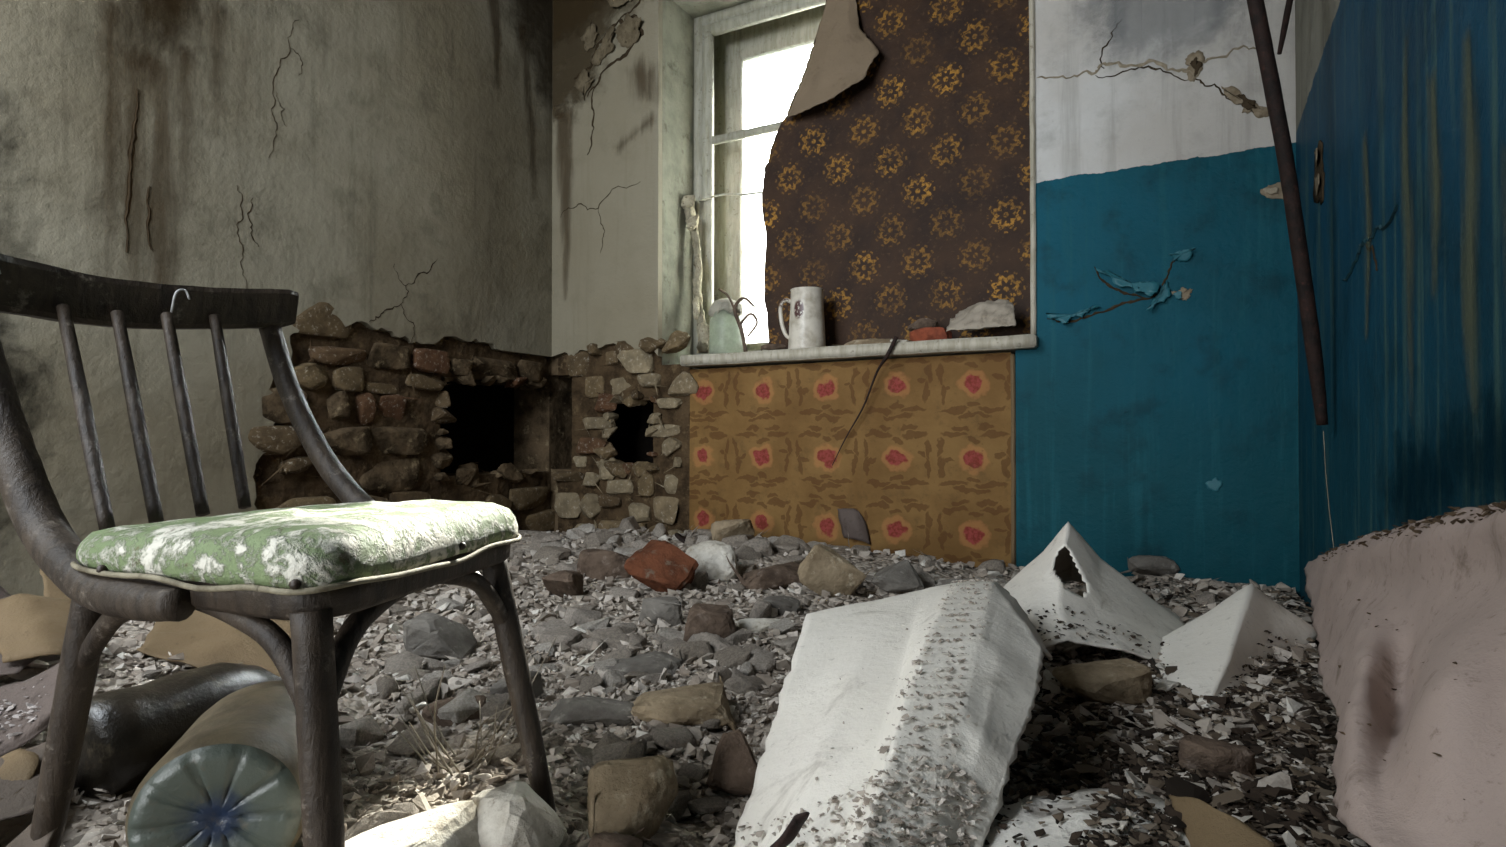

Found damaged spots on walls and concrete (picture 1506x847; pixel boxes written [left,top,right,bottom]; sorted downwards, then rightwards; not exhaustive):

damp [122,0,198,49]
crack [268,20,303,158]
peeling [573,0,644,155]
crack [1037,21,1256,101]
spalling [1185,50,1205,82]
spalling [1221,86,1269,118]
damp [124,88,152,253]
peeling [1046,247,1195,324]
spalling [248,379,342,509]
spalling [290,302,699,536]